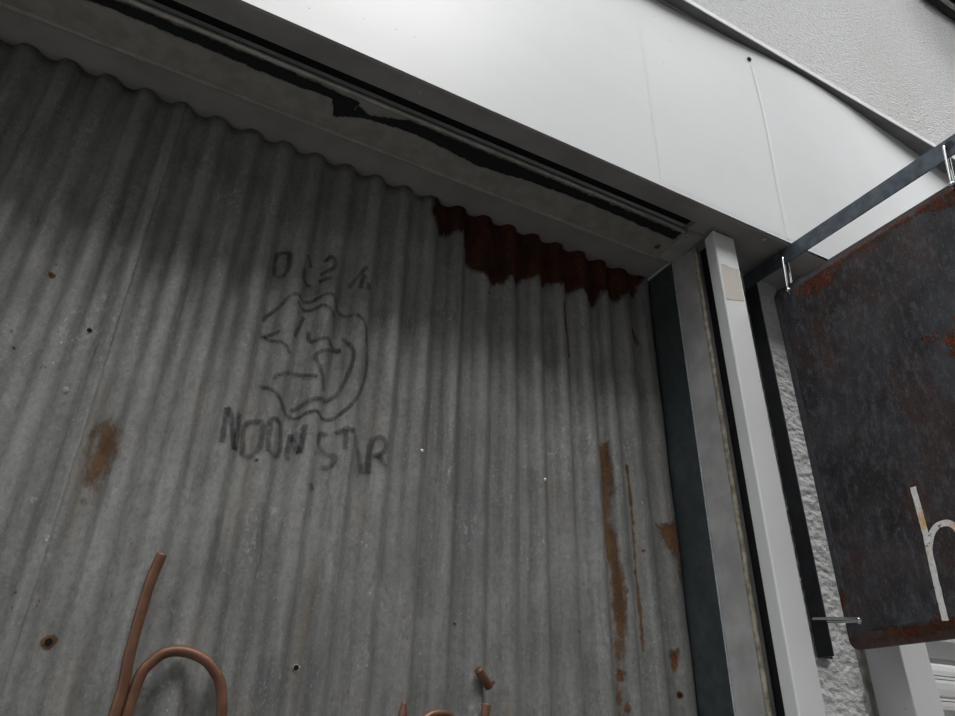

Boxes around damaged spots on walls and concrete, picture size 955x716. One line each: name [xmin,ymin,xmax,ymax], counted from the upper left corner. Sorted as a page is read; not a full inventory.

rust [432,197,644,358]
rust [86,421,117,486]
rust [600,443,645,716]
rust [656,522,682,582]